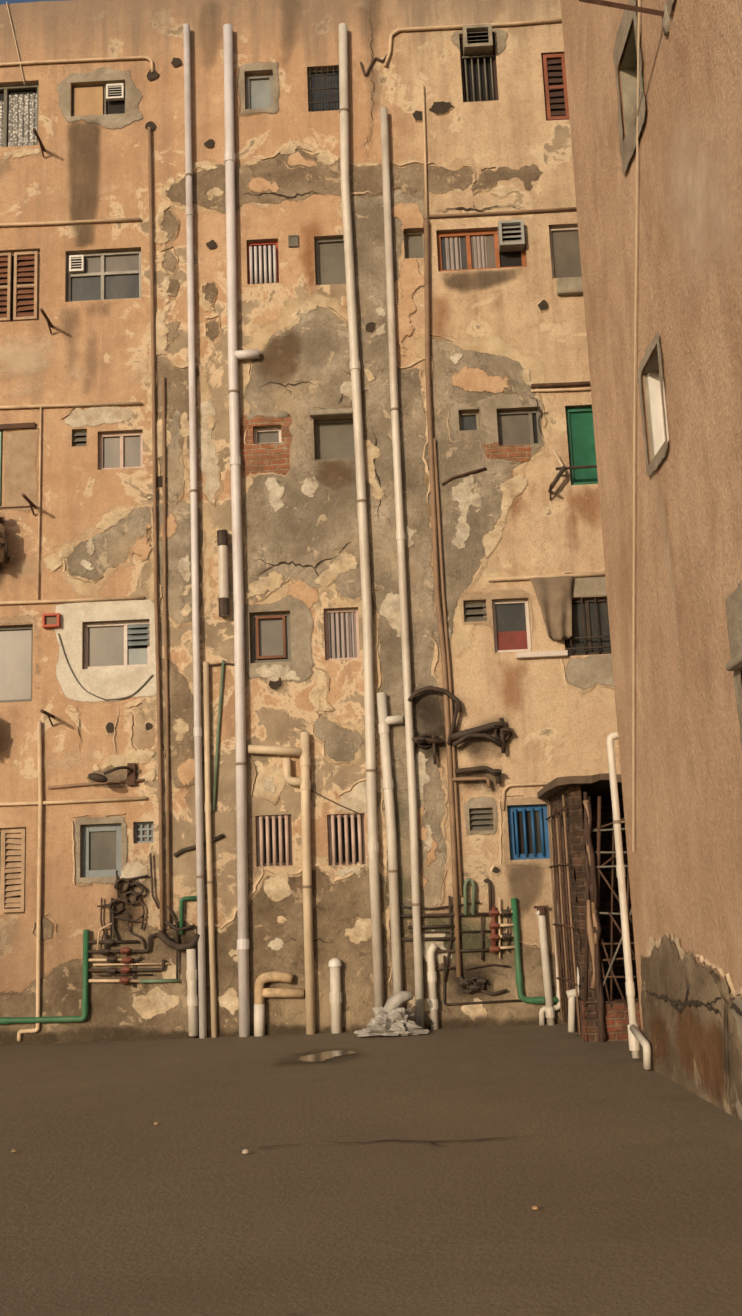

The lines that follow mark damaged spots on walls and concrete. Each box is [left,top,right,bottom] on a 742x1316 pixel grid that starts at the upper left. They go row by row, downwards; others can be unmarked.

damp [70,122,98,243]
damp [261,332,298,376]
crack [262,370,385,513]
spalling [0,139,565,1044]
crack [254,542,350,577]
spalling [640,932,742,1121]
crack [641,970,742,1105]
crack [262,1136,526,1147]